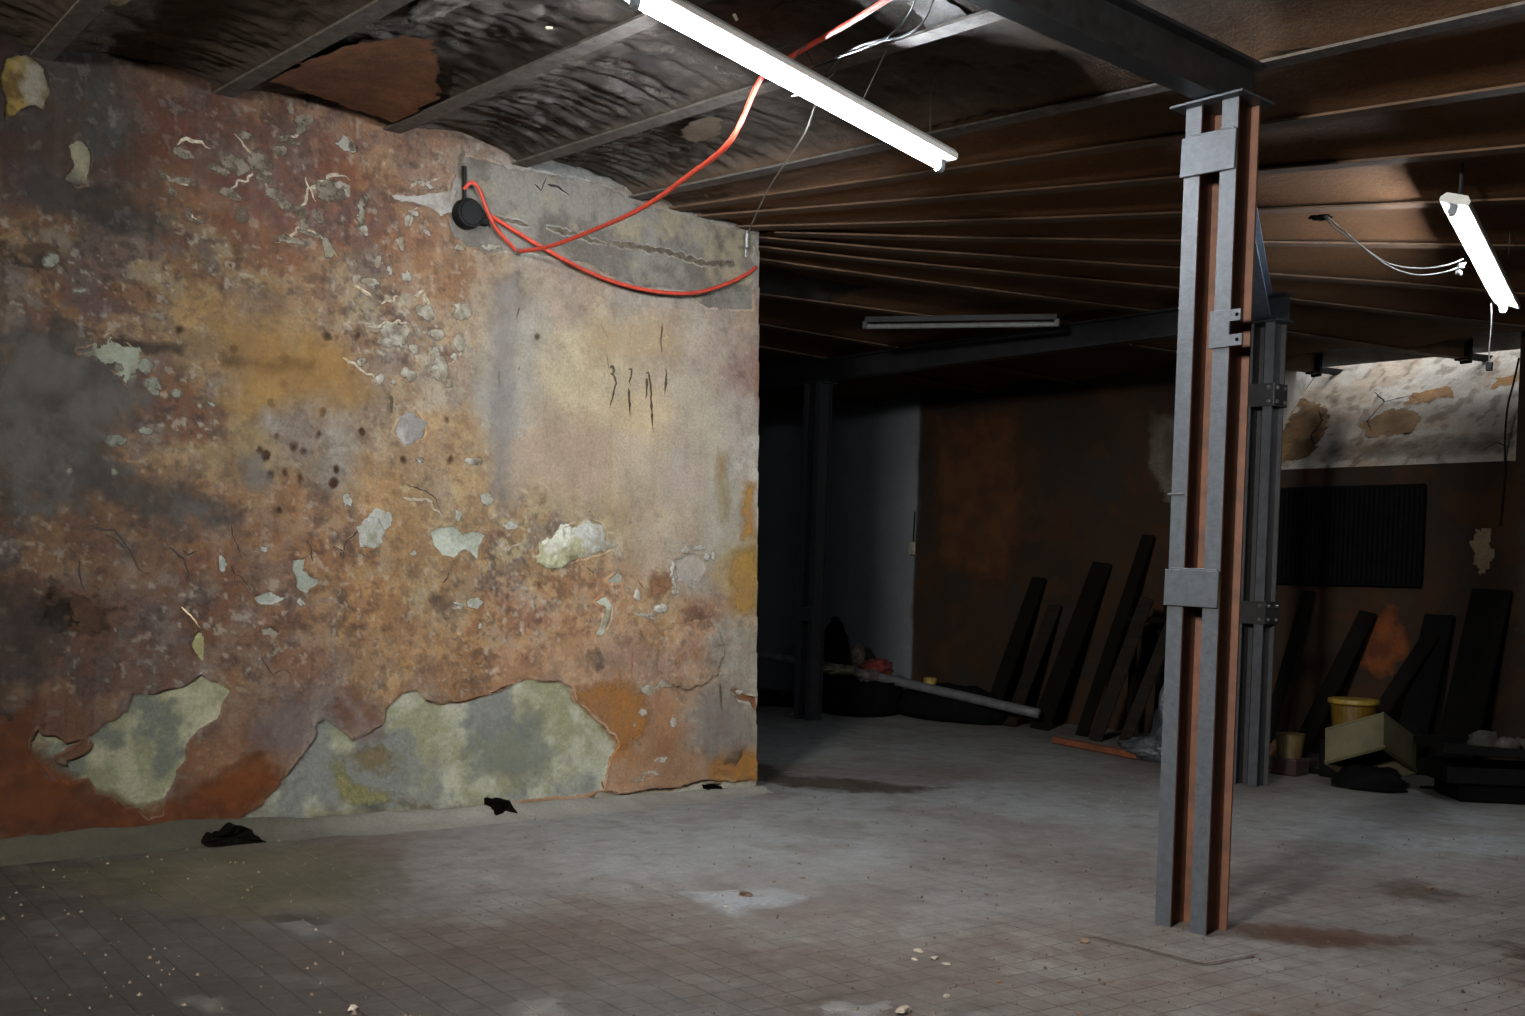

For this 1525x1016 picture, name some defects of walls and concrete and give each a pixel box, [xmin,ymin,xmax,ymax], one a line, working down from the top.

spalling [0,51,55,122]
spalling [1281,398,1330,463]
spalling [1359,386,1454,438]
peeling [431,525,489,565]
spalling [536,517,623,635]
rust [650,573,670,598]
rust [731,485,757,613]
peeling [28,629,232,821]
rust [577,683,650,748]
rust [0,712,279,838]
peeling [201,678,757,847]
rust [711,750,758,780]